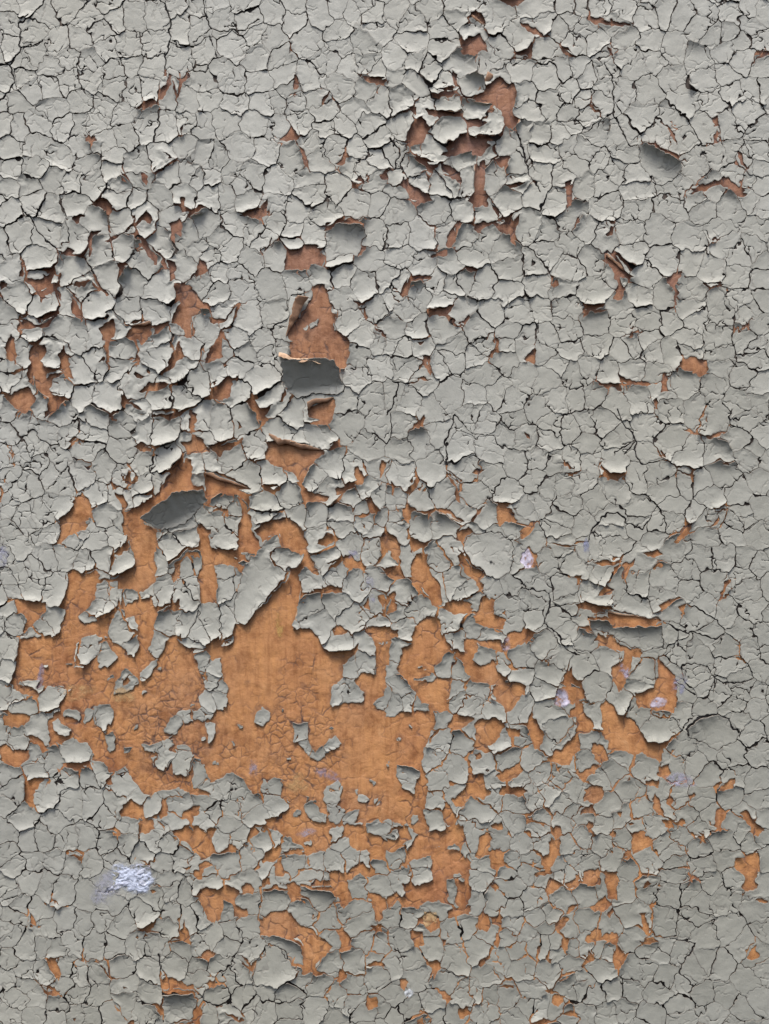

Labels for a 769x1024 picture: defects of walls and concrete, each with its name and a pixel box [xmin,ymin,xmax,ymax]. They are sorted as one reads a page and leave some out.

peeling [351,0,589,210]
crack [0,0,769,788]
peeling [0,134,769,879]
crack [0,842,232,1024]
crack [364,916,560,1024]
crack [648,845,769,1024]